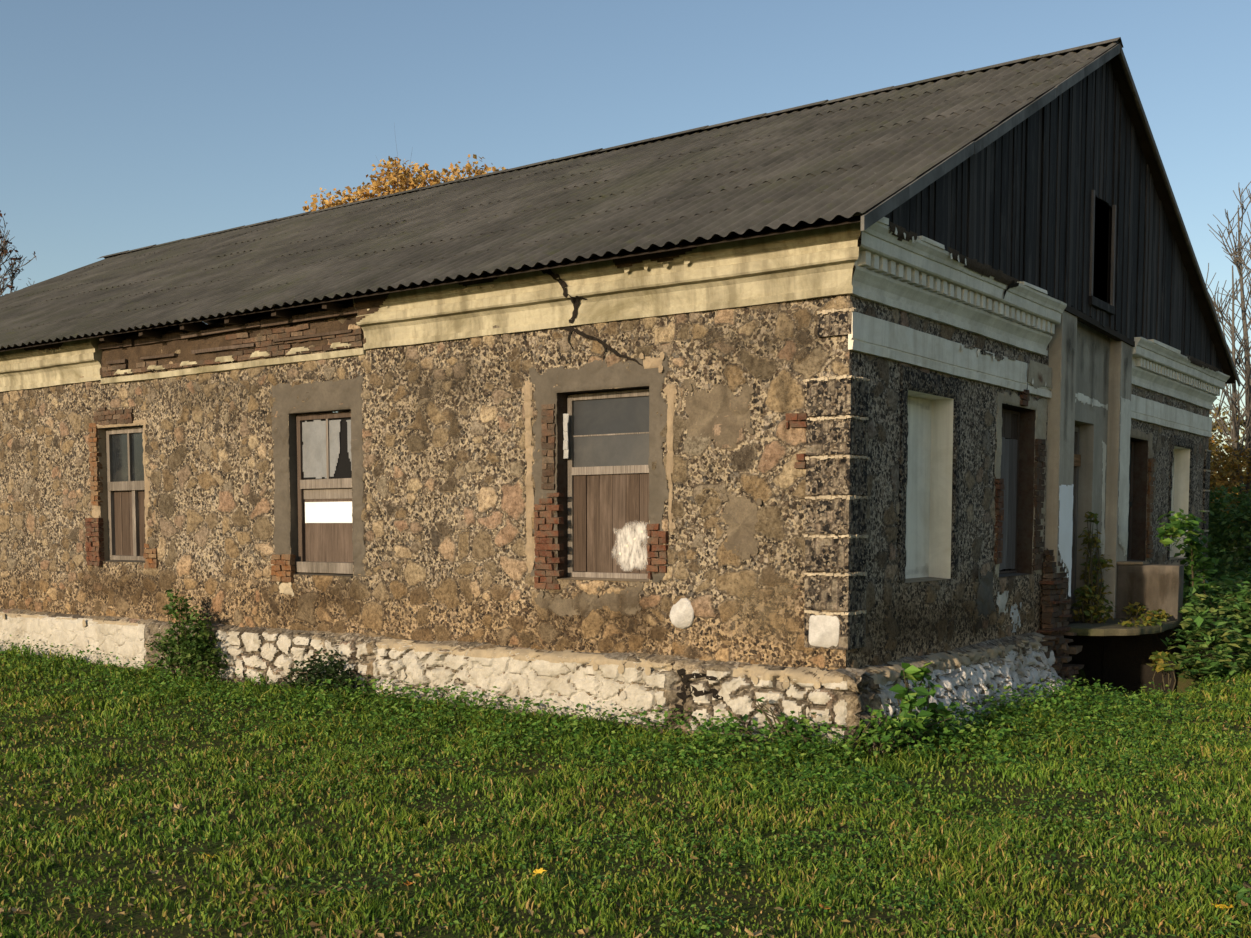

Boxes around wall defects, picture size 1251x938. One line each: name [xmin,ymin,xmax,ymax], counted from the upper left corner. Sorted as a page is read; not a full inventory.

spalling [98,293,398,377]
crack [539,269,643,366]
peeling [1075,393,1131,556]
peeling [876,439,1074,733]